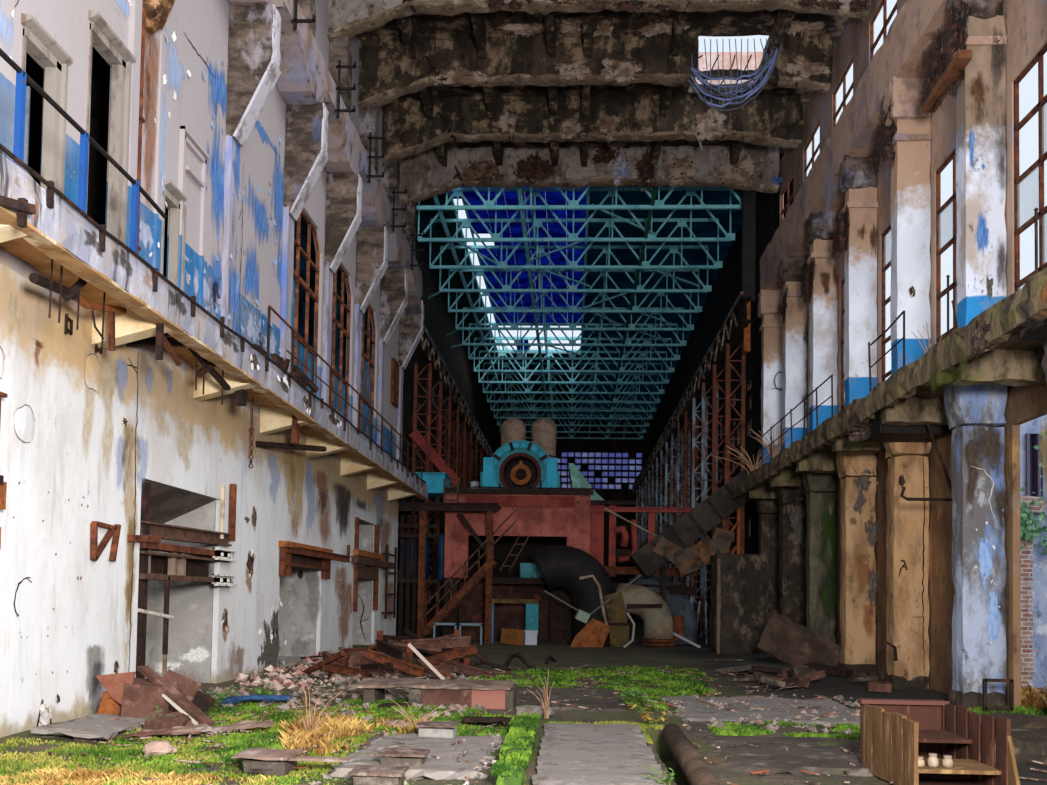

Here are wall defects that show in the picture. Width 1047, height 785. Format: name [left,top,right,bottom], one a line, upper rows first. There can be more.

corrosion [143,30,158,193]
spalling [484,0,690,40]
spalling [554,58,644,84]
spalling [687,0,870,143]
water stain [992,35,1005,82]
spalling [456,112,698,192]
peeling [154,31,284,370]
water stain [997,245,1005,281]
water stain [83,359,126,482]
water stain [308,574,320,619]
peeling [975,522,1000,644]
water stain [87,646,103,713]